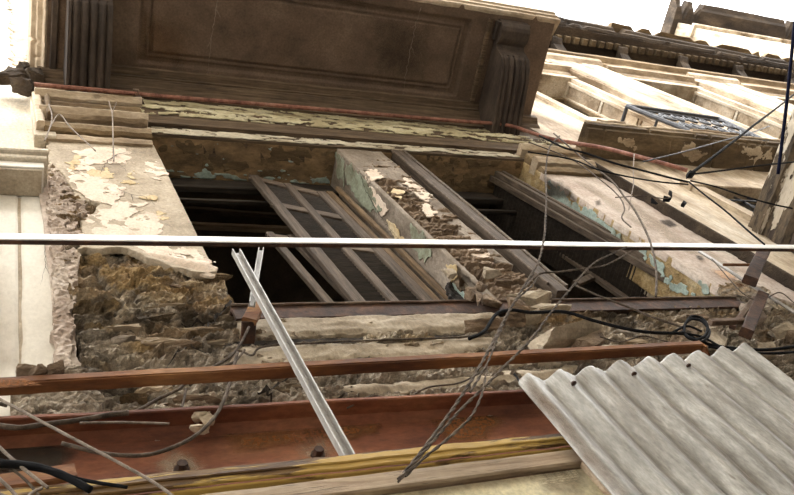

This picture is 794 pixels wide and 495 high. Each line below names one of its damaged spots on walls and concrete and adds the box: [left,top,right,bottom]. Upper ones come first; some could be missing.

peeling [618,137,637,151]
peeling [681,142,708,162]
peeling [741,146,773,166]
flaking render [45,98,572,315]
peeling [551,195,621,239]
flaking render [49,245,248,372]
flaking render [100,380,277,412]
corrosion [340,423,378,437]
corrosion [438,416,499,440]